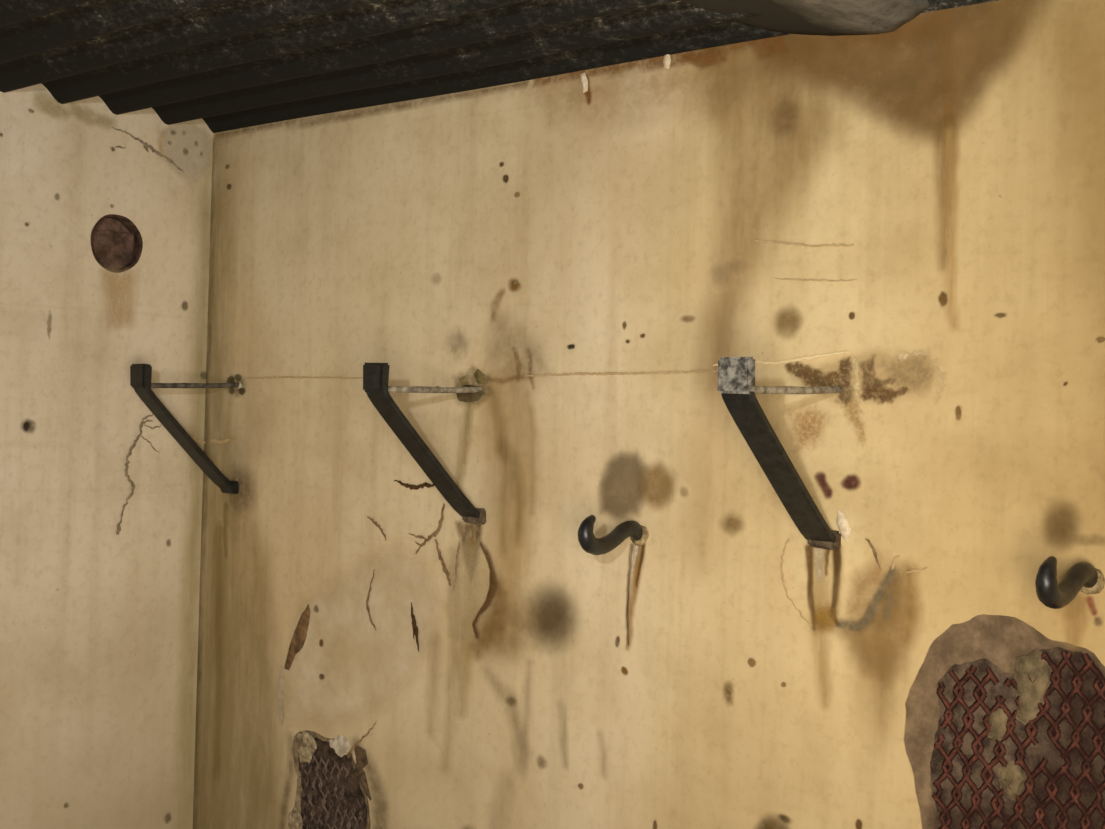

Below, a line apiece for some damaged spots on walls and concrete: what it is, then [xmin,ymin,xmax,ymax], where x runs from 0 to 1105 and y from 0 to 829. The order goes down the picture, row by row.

leakage [761,0,1037,180]
crack [116,414,162,535]
corrosion [816,473,859,497]
peeling [278,553,433,721]
crack [366,569,376,631]
crack [367,480,460,592]
crack [411,602,419,652]
corrosion [458,524,481,573]
corrosion [616,545,645,646]
corrosion [806,546,841,629]
spalling [904,614,1105,829]
spalling [281,730,384,829]